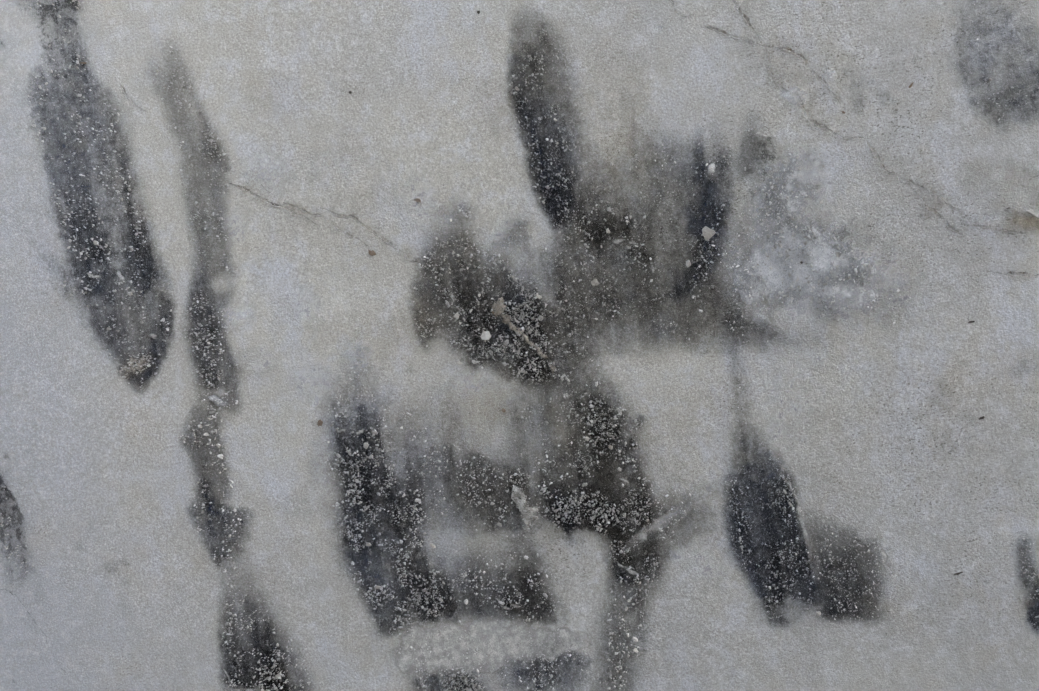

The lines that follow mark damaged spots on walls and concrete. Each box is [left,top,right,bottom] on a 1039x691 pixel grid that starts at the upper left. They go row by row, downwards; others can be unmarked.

crack [710,2,837,97]
damp [25,0,172,391]
damp [147,46,311,691]
damp [316,6,809,691]
damp [0,476,32,573]
damp [722,401,885,624]
damp [1019,536,1039,630]